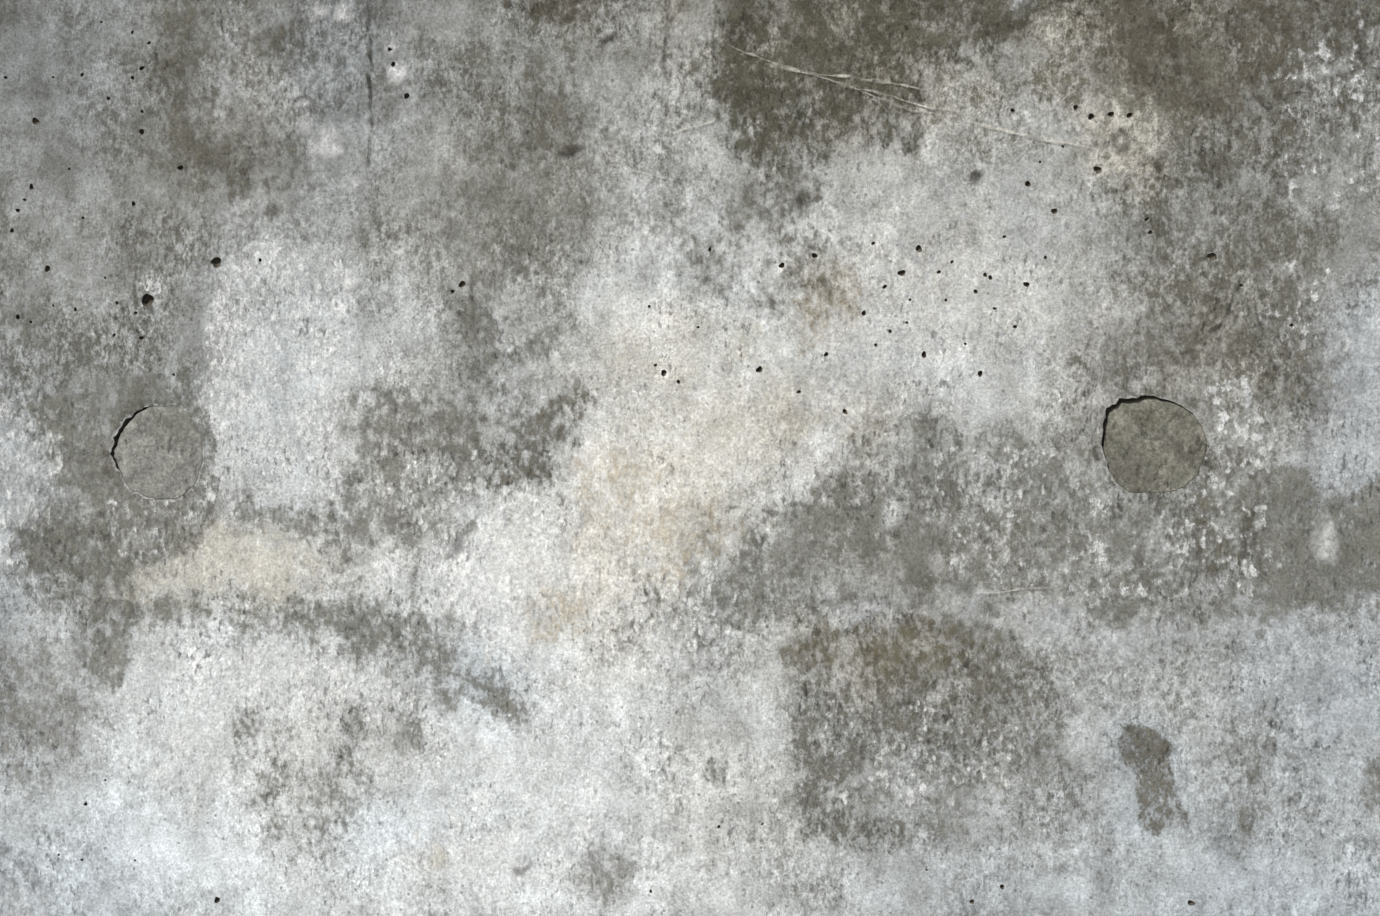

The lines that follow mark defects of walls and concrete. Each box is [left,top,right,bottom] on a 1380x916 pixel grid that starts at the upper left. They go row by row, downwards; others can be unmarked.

damp [0,45,595,862]
damp [622,396,1380,859]